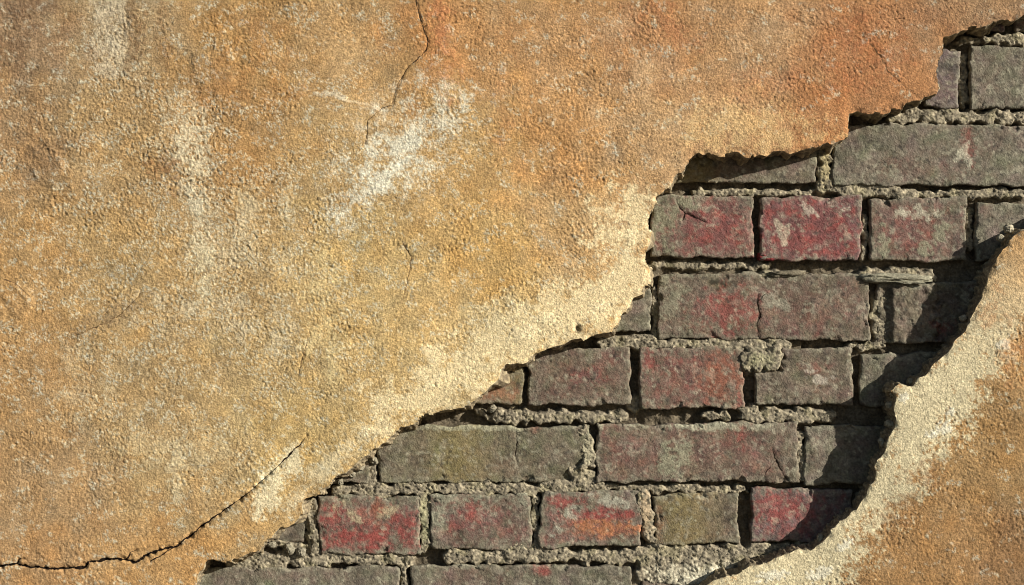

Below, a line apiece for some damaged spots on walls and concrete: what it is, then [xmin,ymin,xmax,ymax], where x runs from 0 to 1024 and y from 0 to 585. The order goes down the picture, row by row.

crack [364,0,428,148]
spalling [197,15,1024,585]
crack [0,435,307,570]